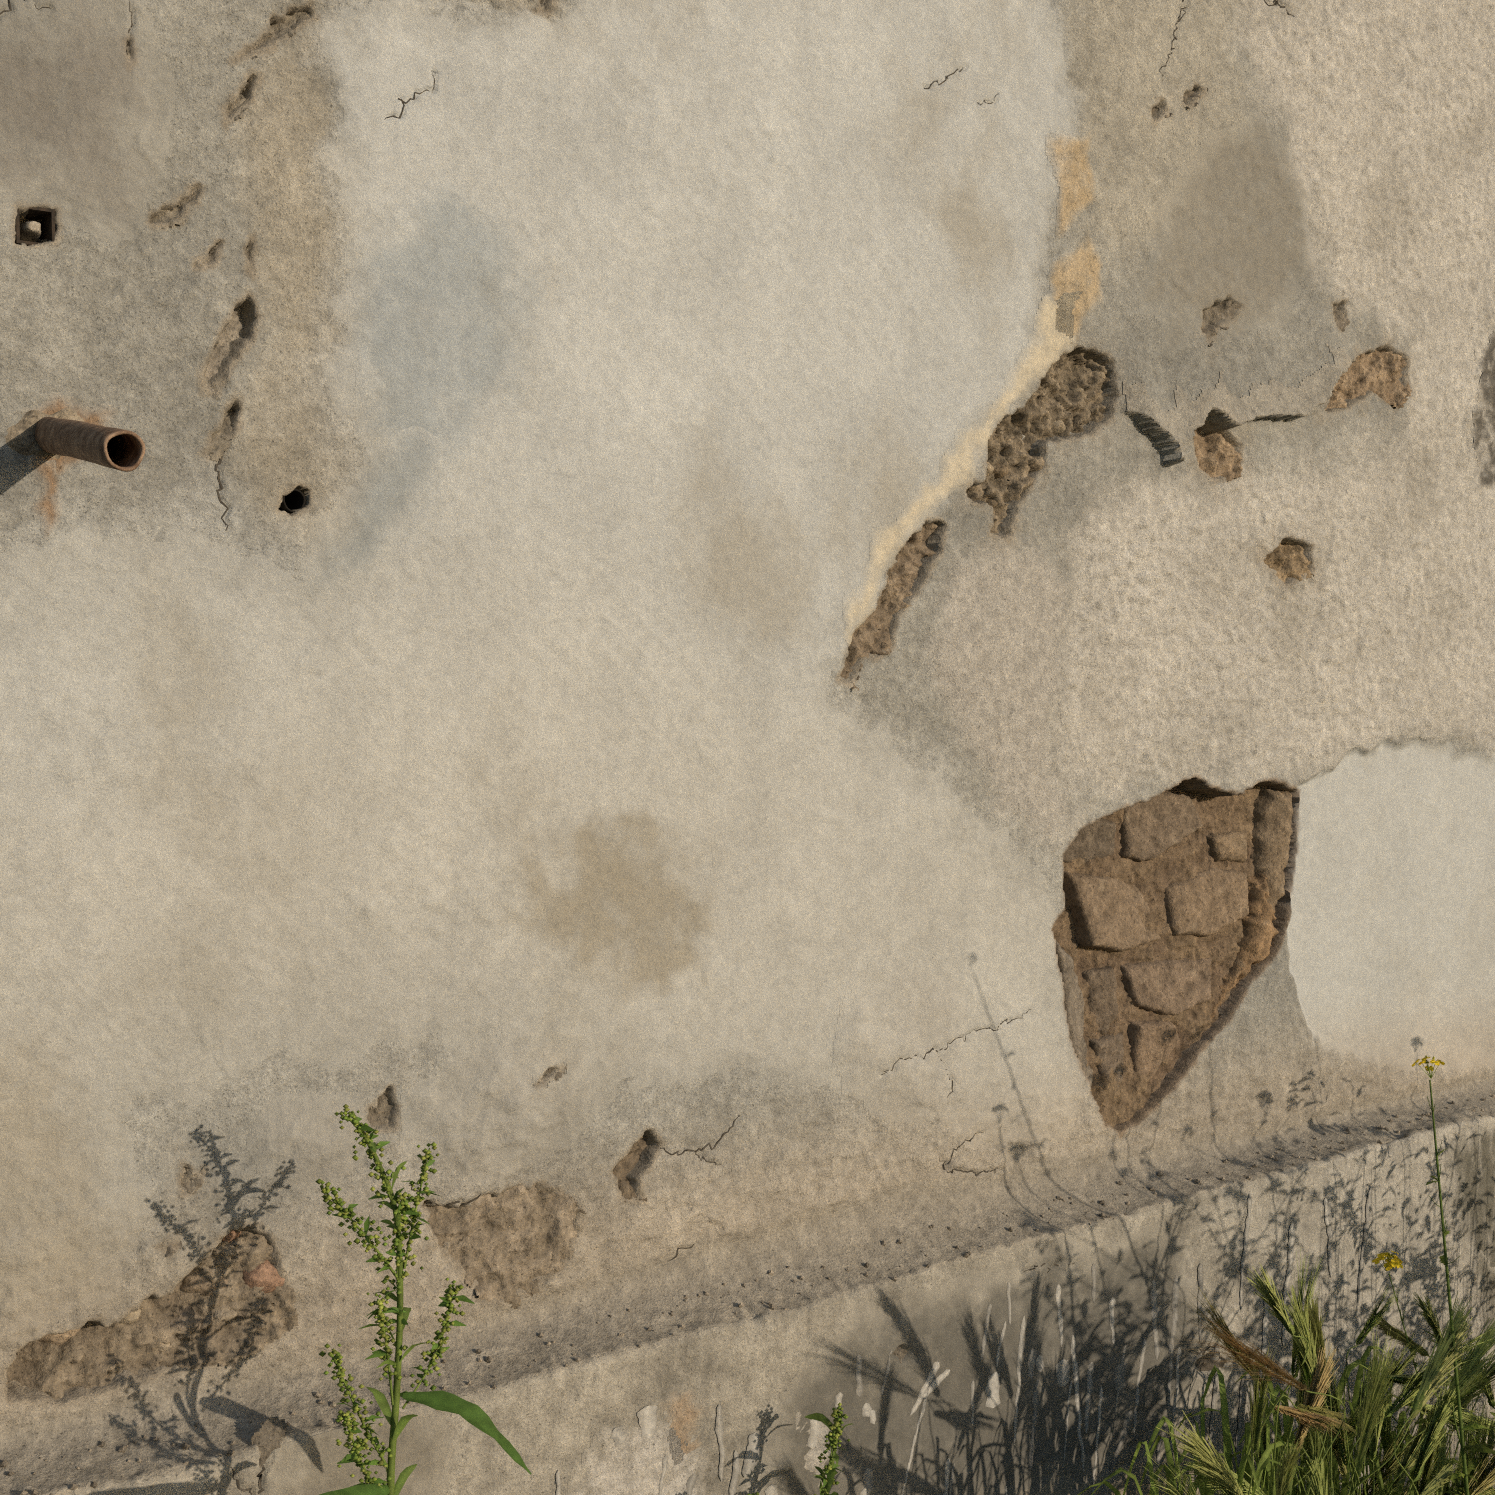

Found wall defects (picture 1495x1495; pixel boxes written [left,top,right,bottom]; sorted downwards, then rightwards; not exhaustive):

flaking render [966,300,1412,534]
damp [1471,405,1495,493]
flaking render [840,523,938,691]
spalling [1052,785,1293,1128]
flaking render [6,1230,299,1399]
flaking render [426,1183,587,1309]